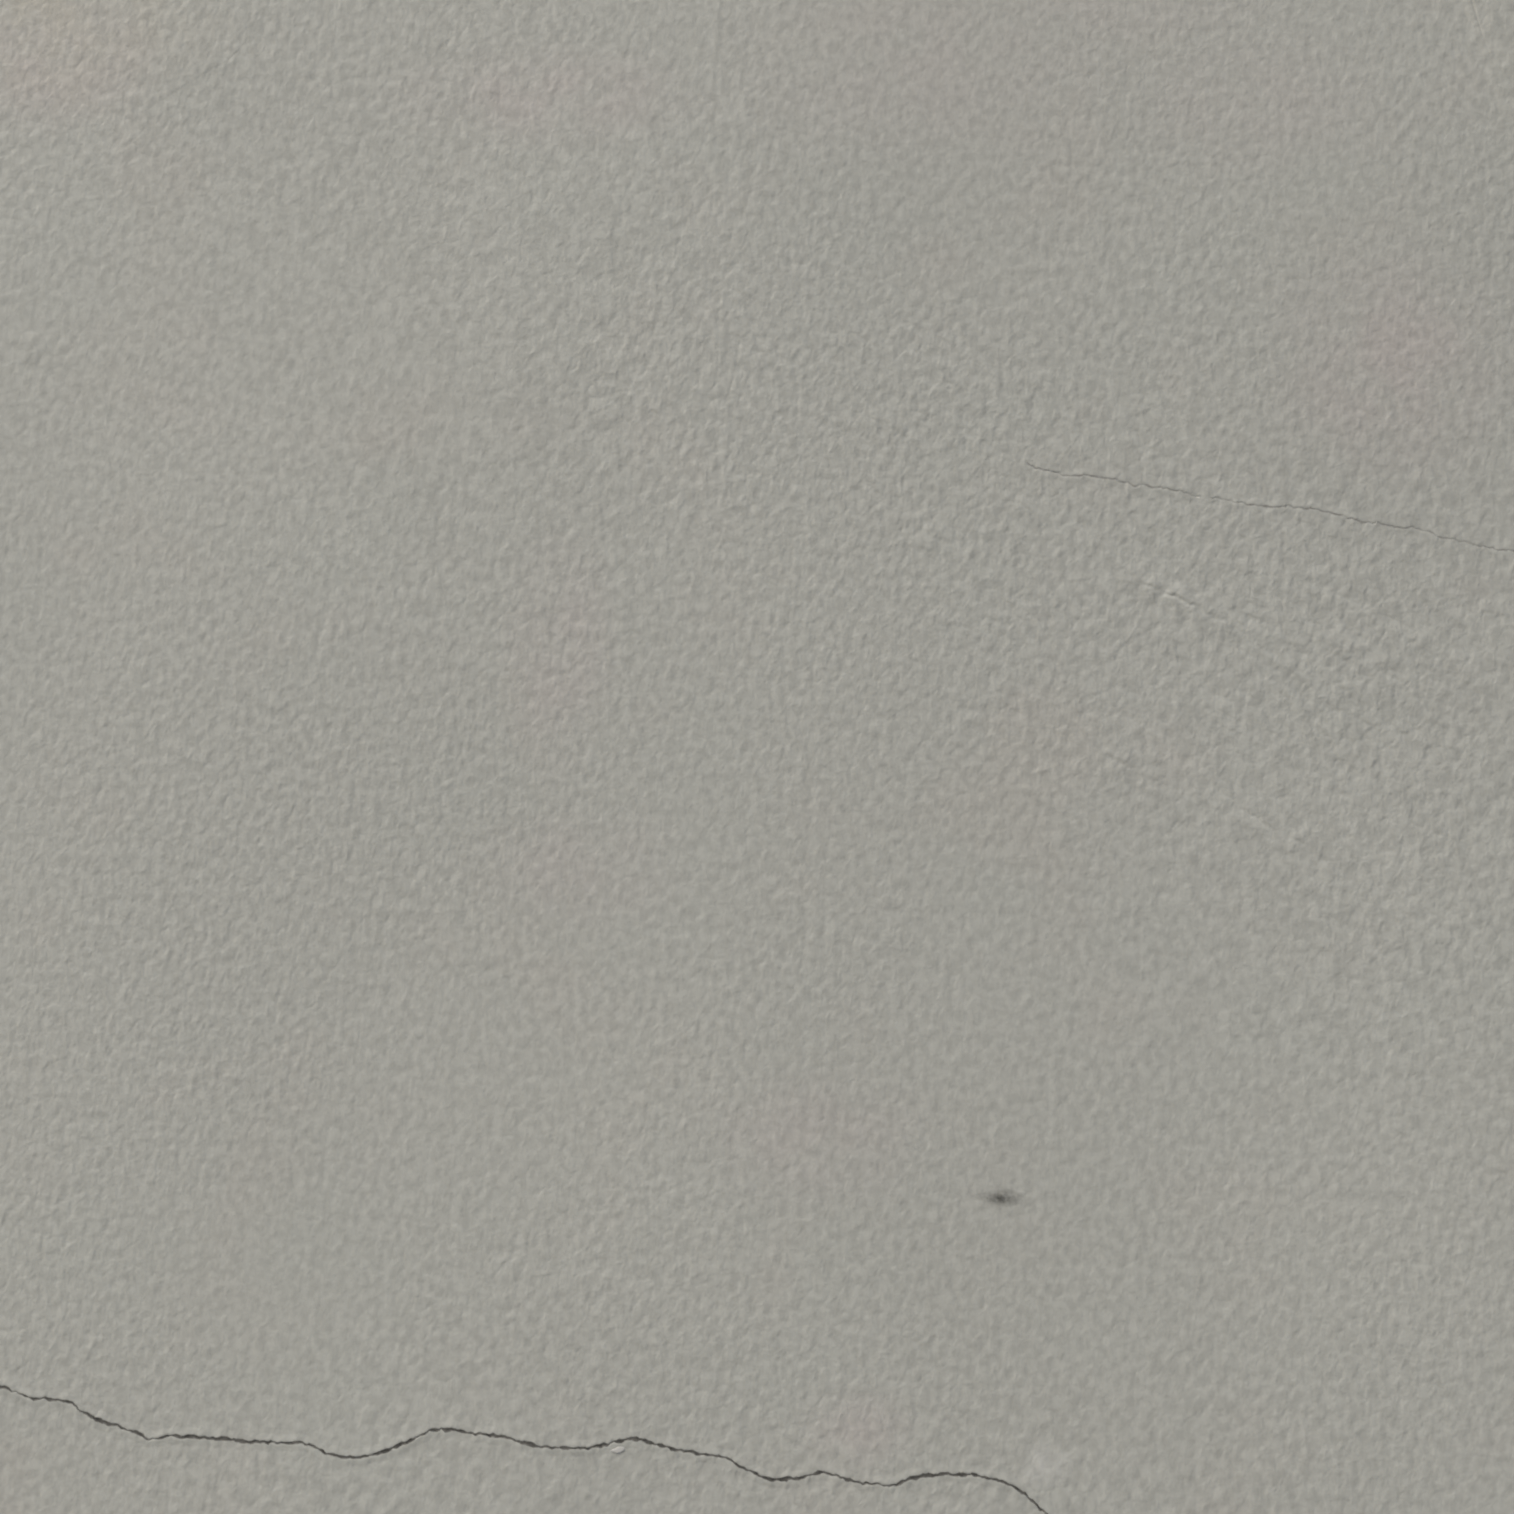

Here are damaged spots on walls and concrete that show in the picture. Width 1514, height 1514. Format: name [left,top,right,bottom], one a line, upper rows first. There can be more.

crack [0,1378,1058,1514]